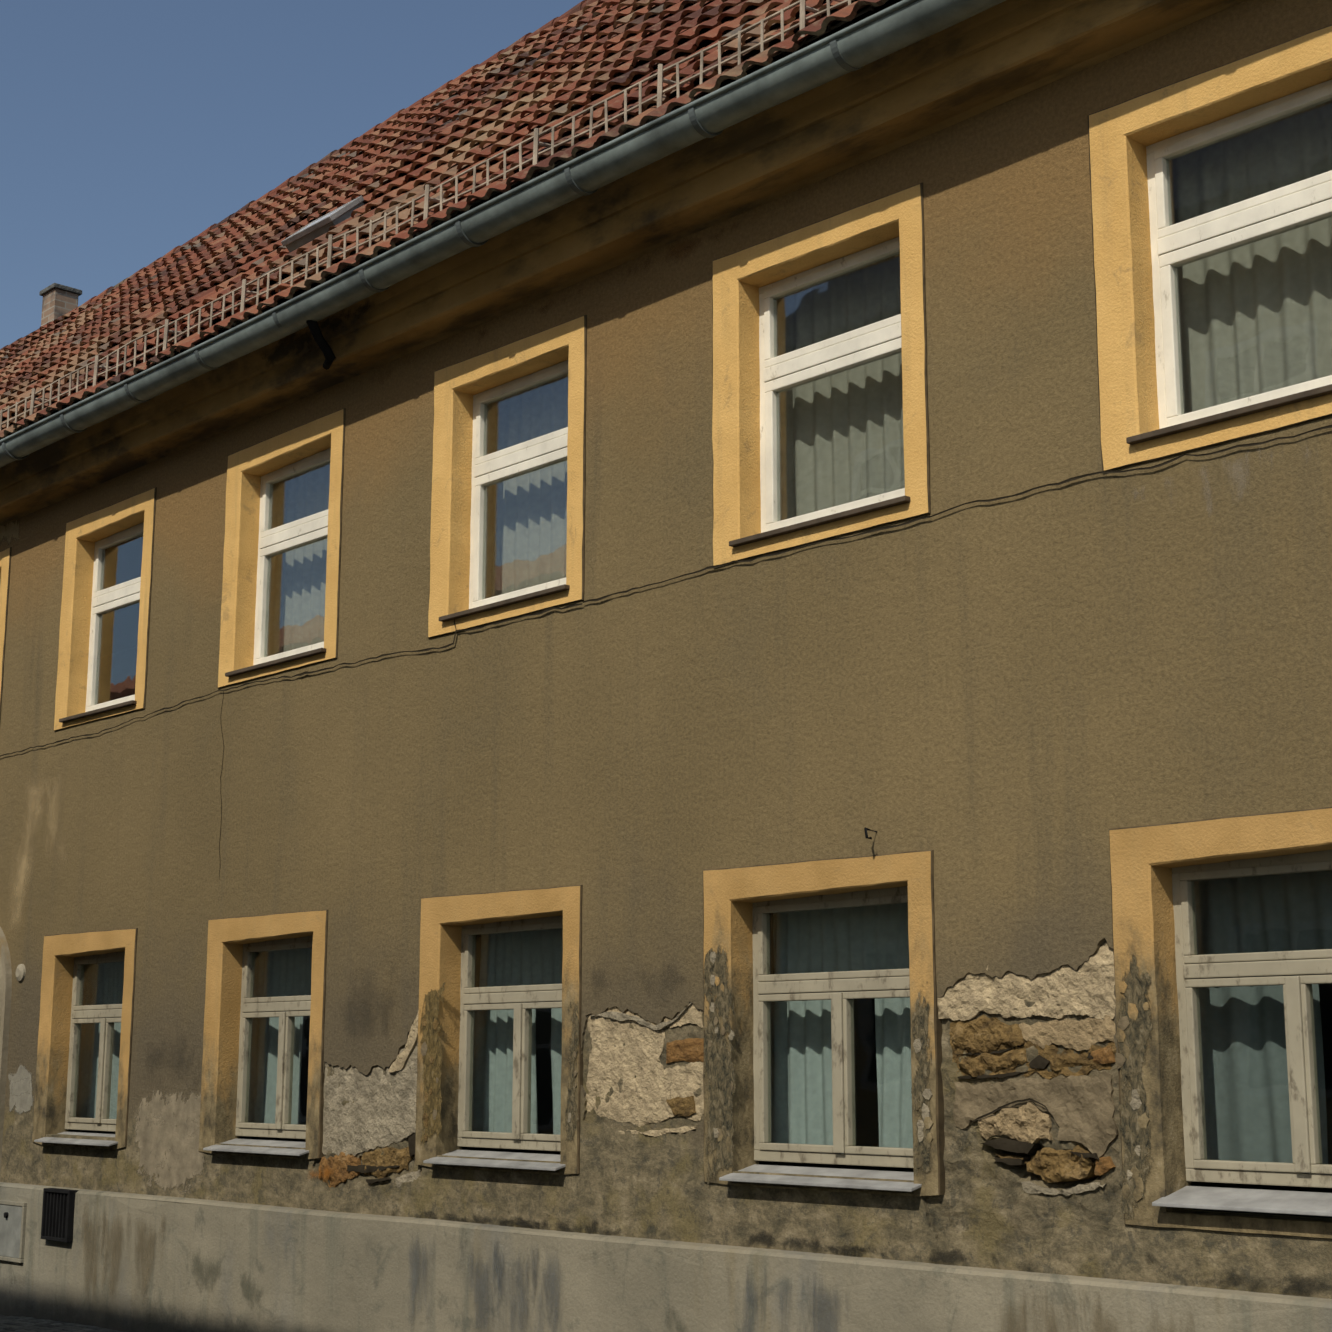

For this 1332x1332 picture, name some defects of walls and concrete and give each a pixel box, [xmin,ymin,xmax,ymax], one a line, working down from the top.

crack [0,425,1332,873]
flaking render [315,982,445,1193]
flaking render [565,946,736,1185]
flaking render [912,940,1153,1244]
damp [424,1211,618,1235]
damp [749,1232,864,1257]
damp [930,1251,963,1264]